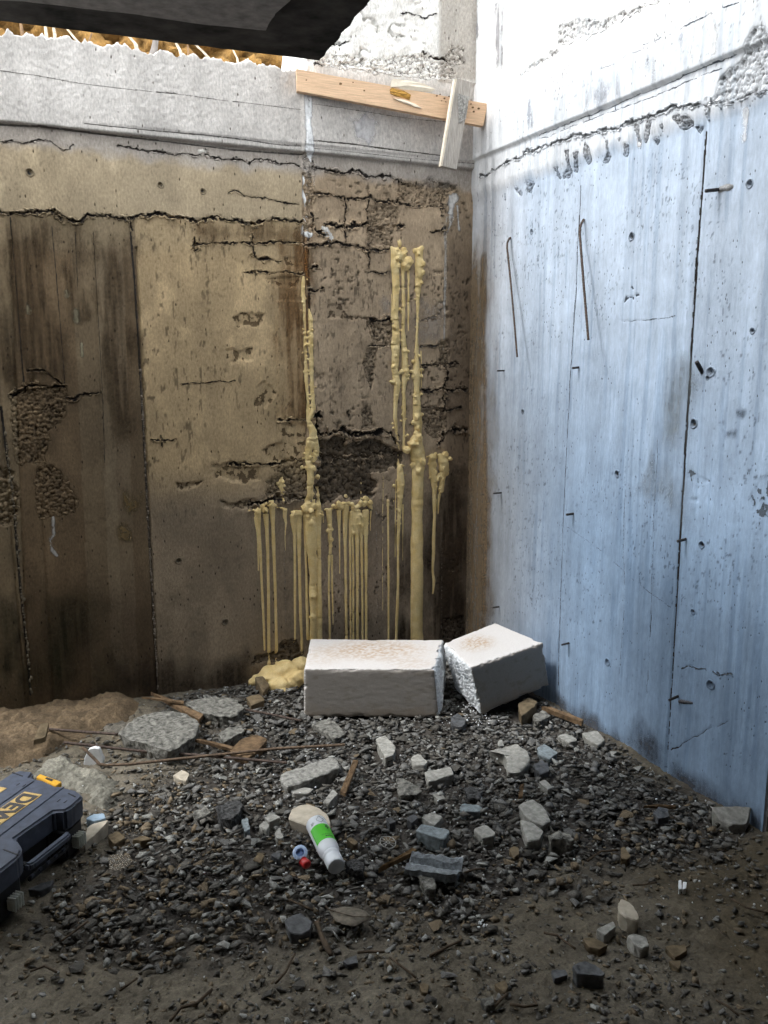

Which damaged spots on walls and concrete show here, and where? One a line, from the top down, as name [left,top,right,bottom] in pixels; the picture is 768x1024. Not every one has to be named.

spalling [519,48,559,77]
crack [0,137,75,151]
crack [0,143,448,295]
water stain [2,225,61,390]
water stain [66,255,137,434]
spalling [265,423,306,462]
spalling [33,465,79,520]
spalling [215,462,259,484]